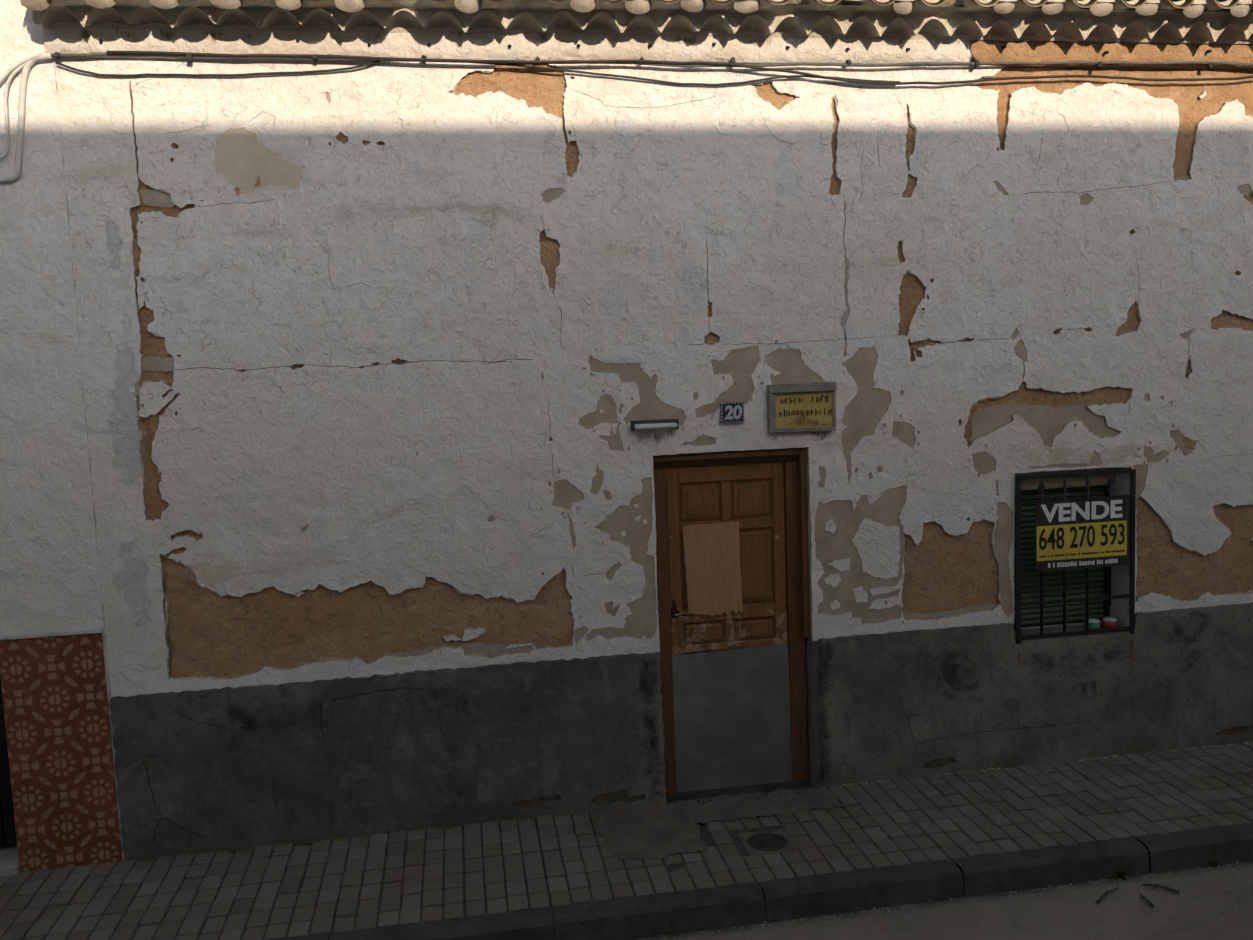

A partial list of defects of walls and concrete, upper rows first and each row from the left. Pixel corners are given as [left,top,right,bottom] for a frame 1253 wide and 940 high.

spalling [448,64,579,202]
spalling [1079,193,1094,205]
spalling [969,66,1253,182]
spalling [1237,184,1253,204]
spalling [128,177,195,521]
crack [176,359,533,372]
peeling [579,302,825,451]
peeling [840,346,920,483]
spalling [160,464,658,680]
peeling [814,381,1172,625]
spalling [1133,424,1253,601]